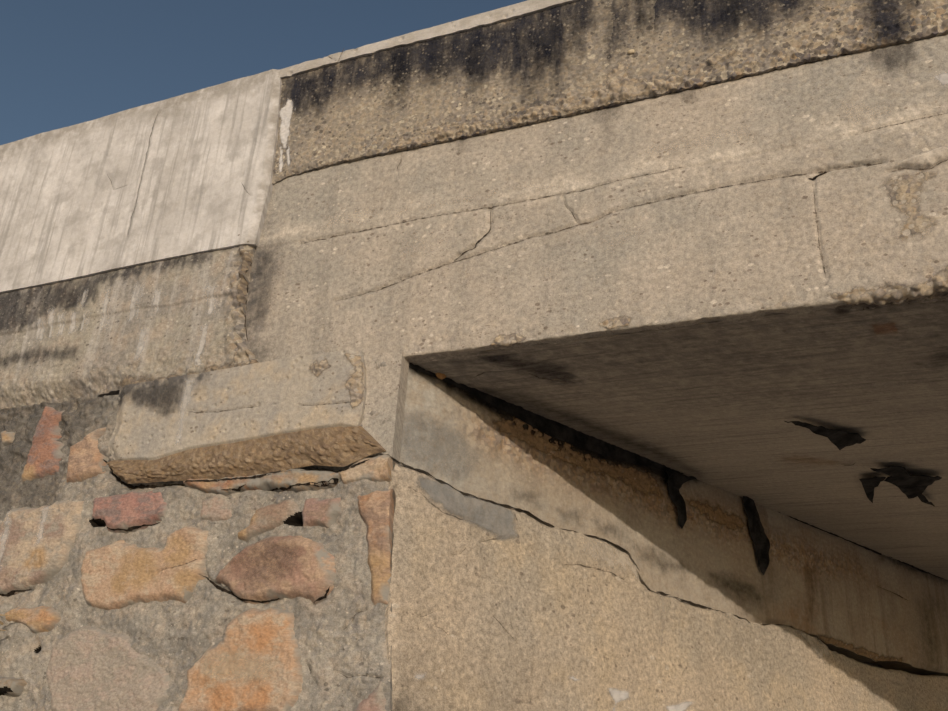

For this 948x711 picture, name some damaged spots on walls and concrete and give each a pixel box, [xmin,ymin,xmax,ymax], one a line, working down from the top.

leakage [284,0,592,111]
leakage [653,0,802,36]
leakage [869,0,912,68]
crack [305,159,948,301]
leakage [0,254,203,337]
leakage [0,349,76,366]
peeling [784,421,866,450]
crack [401,465,552,528]
spalling [493,417,770,577]
peeling [859,466,942,507]
crack [565,535,711,610]